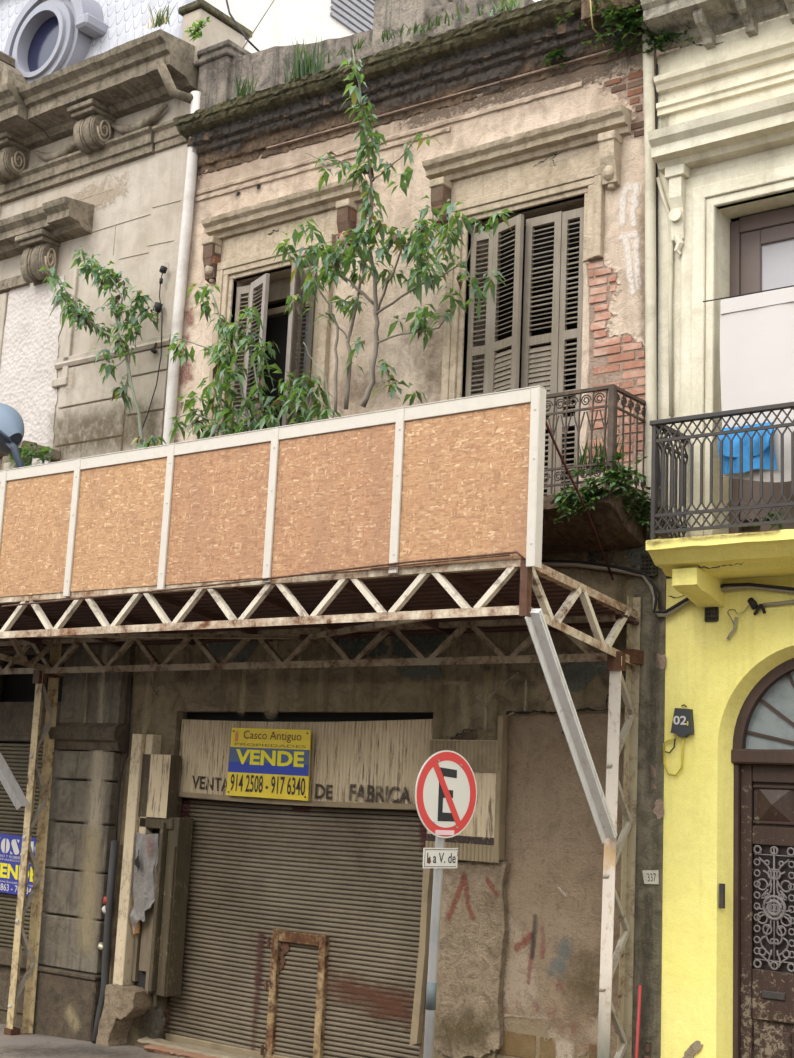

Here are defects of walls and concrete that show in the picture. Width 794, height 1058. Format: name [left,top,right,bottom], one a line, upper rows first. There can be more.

leakage [190,15,640,153]
peeling [399,59,644,141]
flaking render [582,251,646,478]
crack [449,666,622,740]